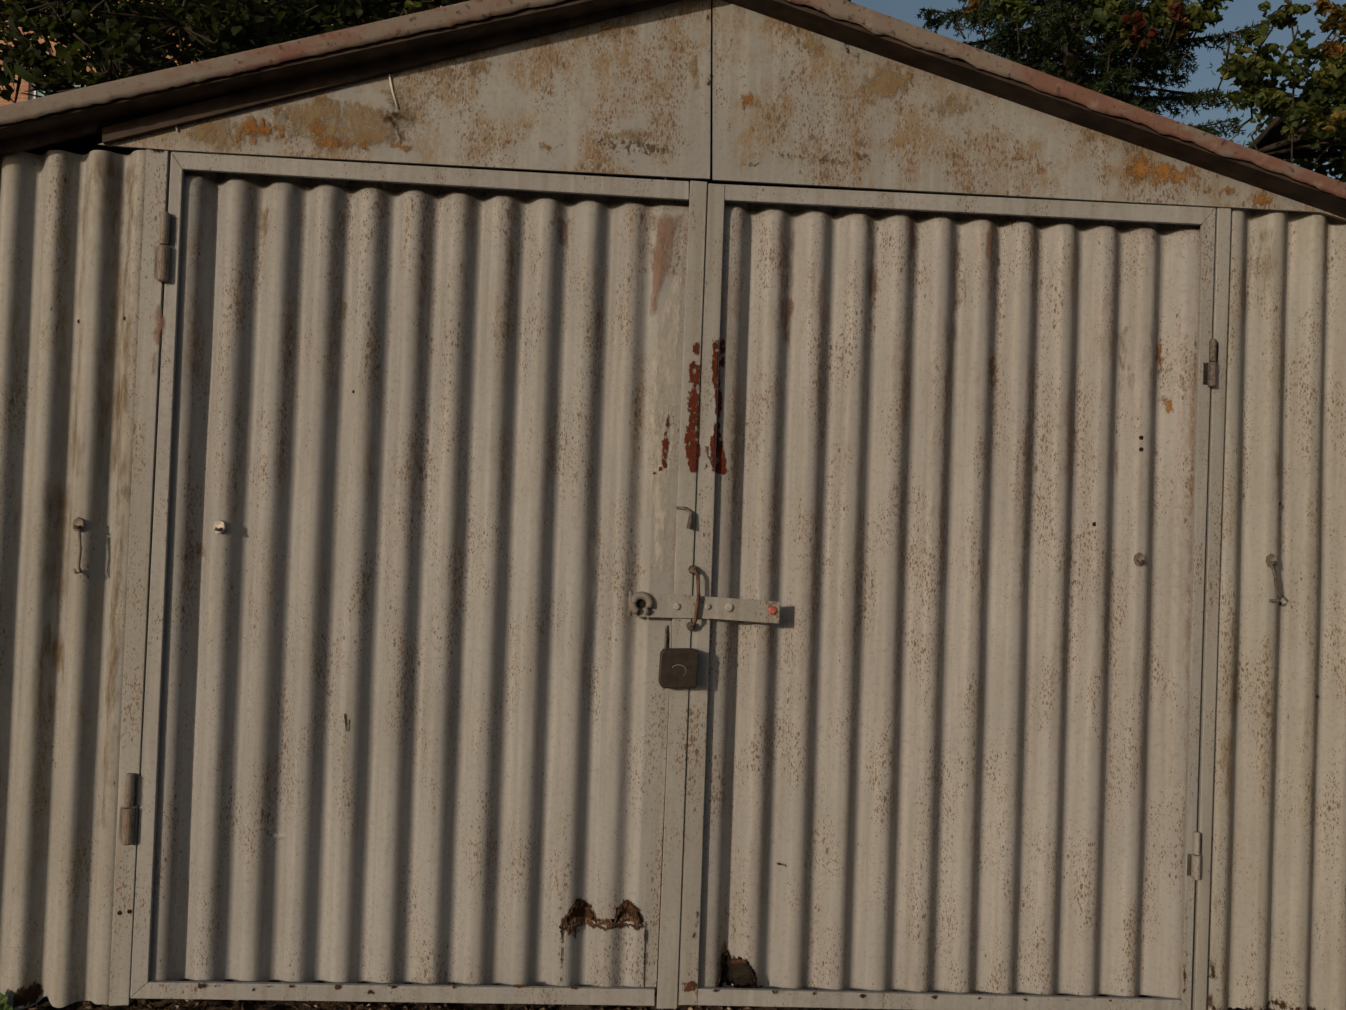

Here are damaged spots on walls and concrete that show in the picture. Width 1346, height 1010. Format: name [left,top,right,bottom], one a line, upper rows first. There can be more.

rust [186,87,416,156]
rust [1126,151,1271,206]
rust [11,981,43,1008]